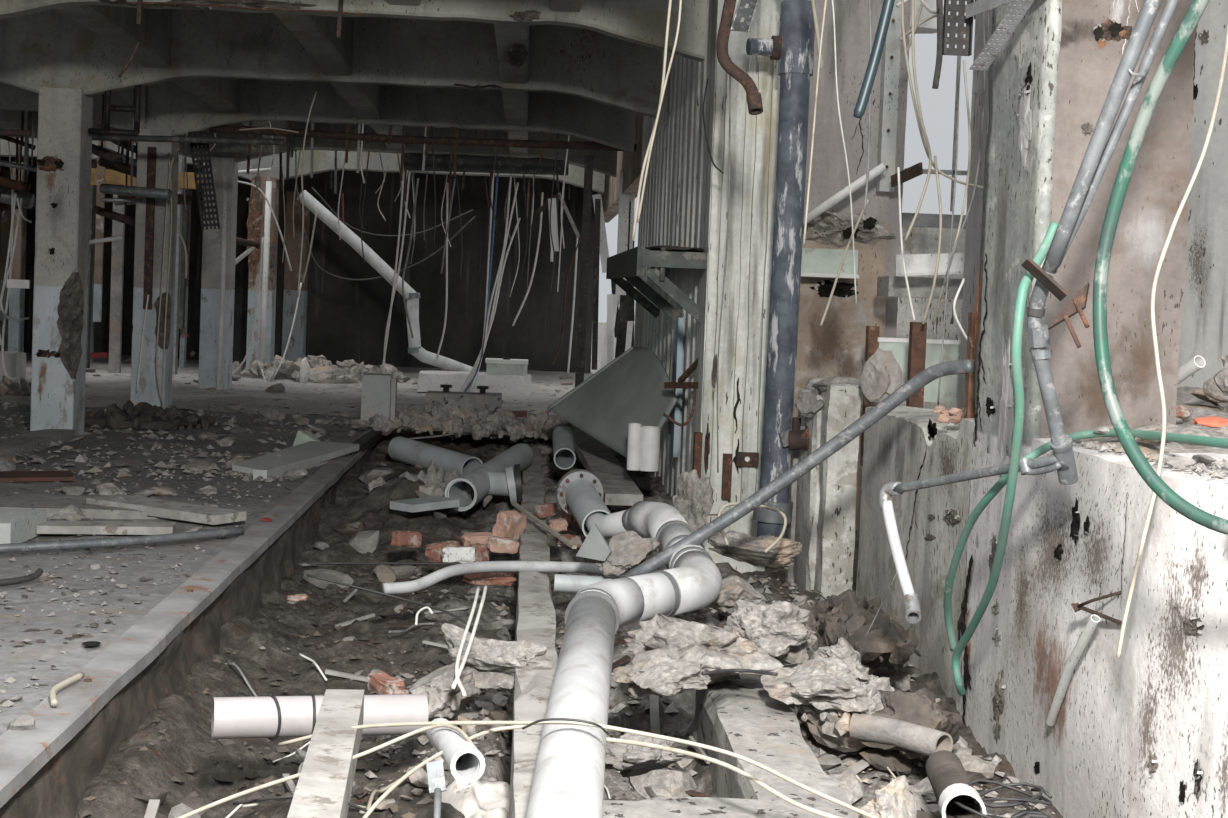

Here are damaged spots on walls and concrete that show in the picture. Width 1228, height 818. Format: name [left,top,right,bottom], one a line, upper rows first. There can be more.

spalling [1093,18,1132,47]
spalling [35,272,84,381]
spalling [143,147,172,352]
crack [974,254,988,447]